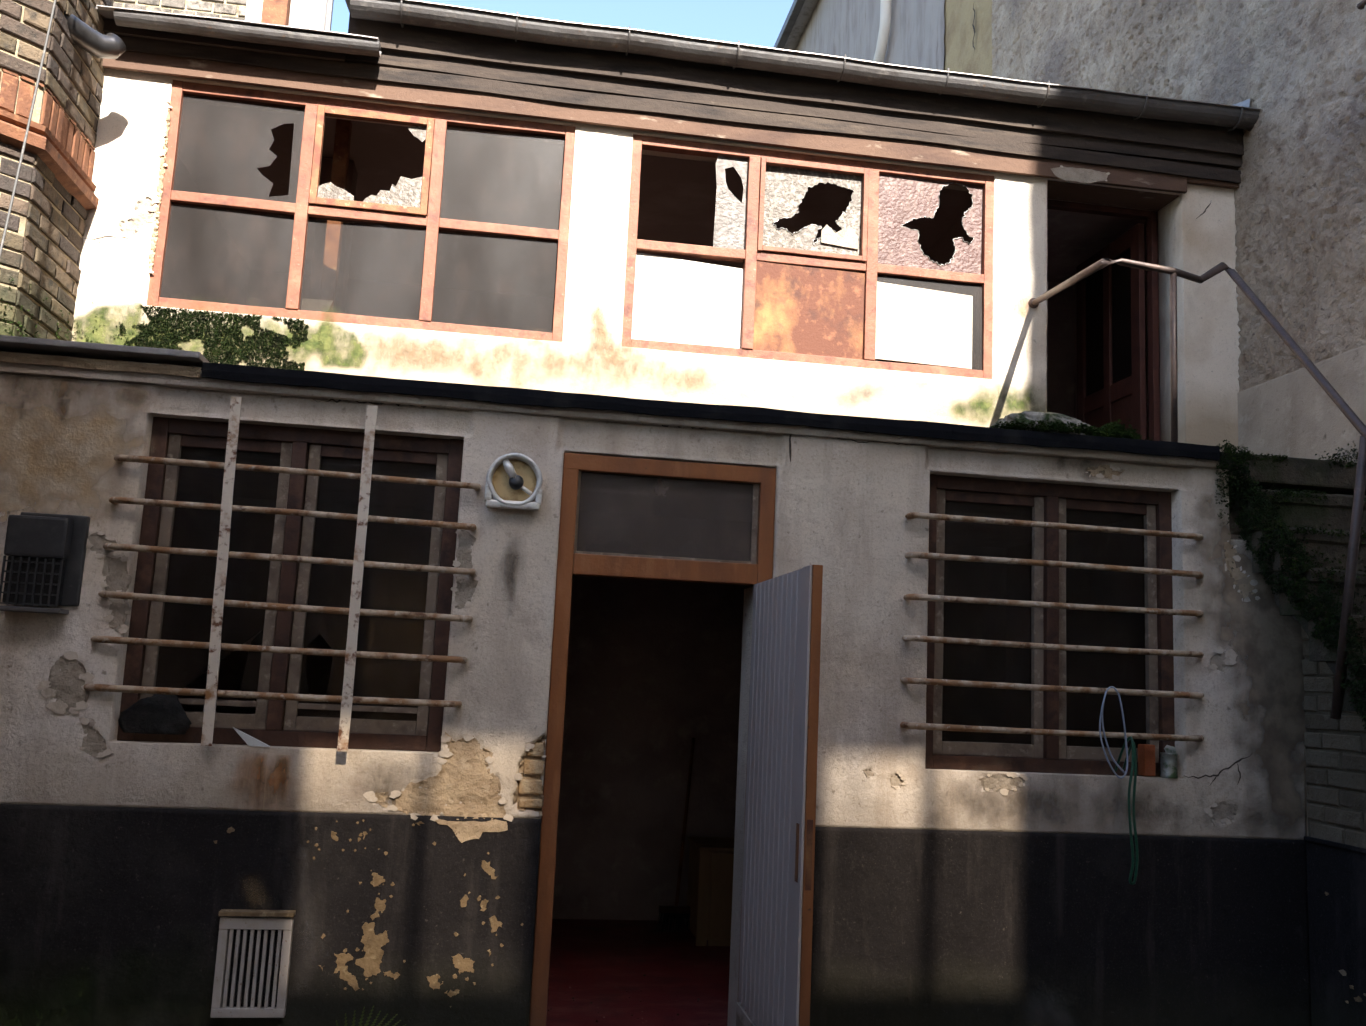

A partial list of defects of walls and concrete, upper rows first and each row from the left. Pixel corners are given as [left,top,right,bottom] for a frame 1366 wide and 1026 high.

peeling [119,100,172,274]
peeling [1051,165,1110,184]
damp [74,305,141,346]
damp [319,322,527,375]
damp [545,307,638,376]
rust [753,260,865,360]
peeling [86,531,132,634]
rust [241,757,288,798]
flaking render [363,732,546,879]
crack [1185,755,1251,785]
peeling [319,870,406,991]
peeling [427,892,504,1008]